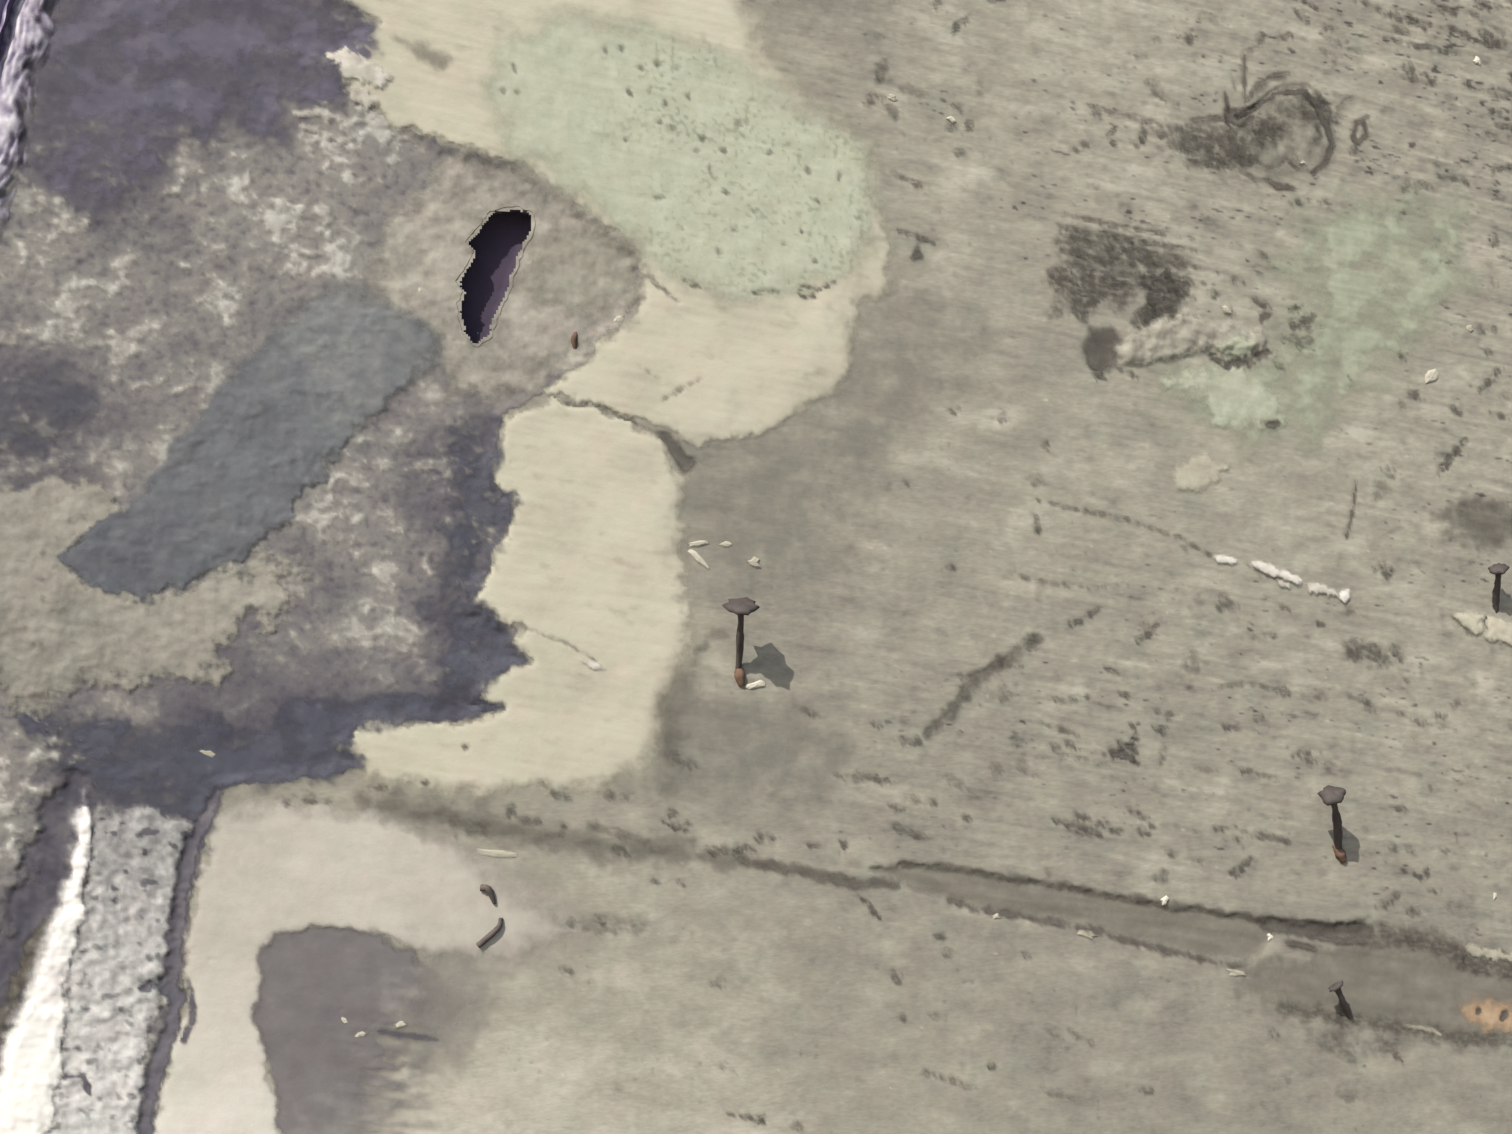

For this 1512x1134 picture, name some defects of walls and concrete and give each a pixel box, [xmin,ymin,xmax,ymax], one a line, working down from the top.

leakage [486,8,871,300]
leakage [1060,219,1206,326]
spalling [0,0,891,1071]
rust [734,667,745,686]
peeling [43,775,582,1134]
leakage [252,927,477,1134]
rust [1332,844,1347,863]
rust [1462,999,1512,1032]